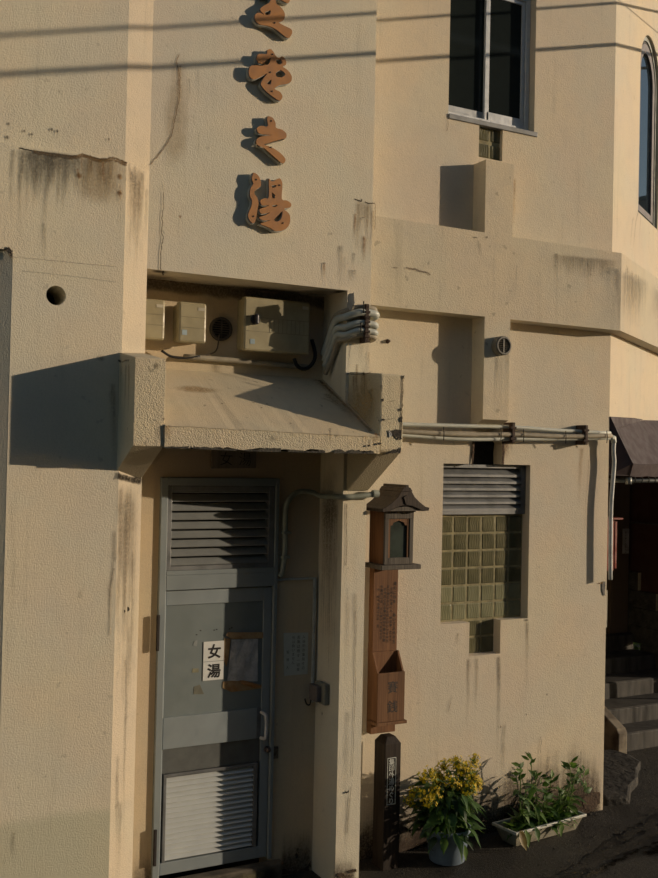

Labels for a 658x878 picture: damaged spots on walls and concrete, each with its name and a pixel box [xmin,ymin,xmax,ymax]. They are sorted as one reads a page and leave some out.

crack [151,55,180,165]
crack [20,148,128,166]
crack [158,186,166,270]
peeling [165,445,374,454]
spalling [378,418,402,454]
damp [457,773,598,837]
damp [359,826,373,860]
damp [399,819,428,852]